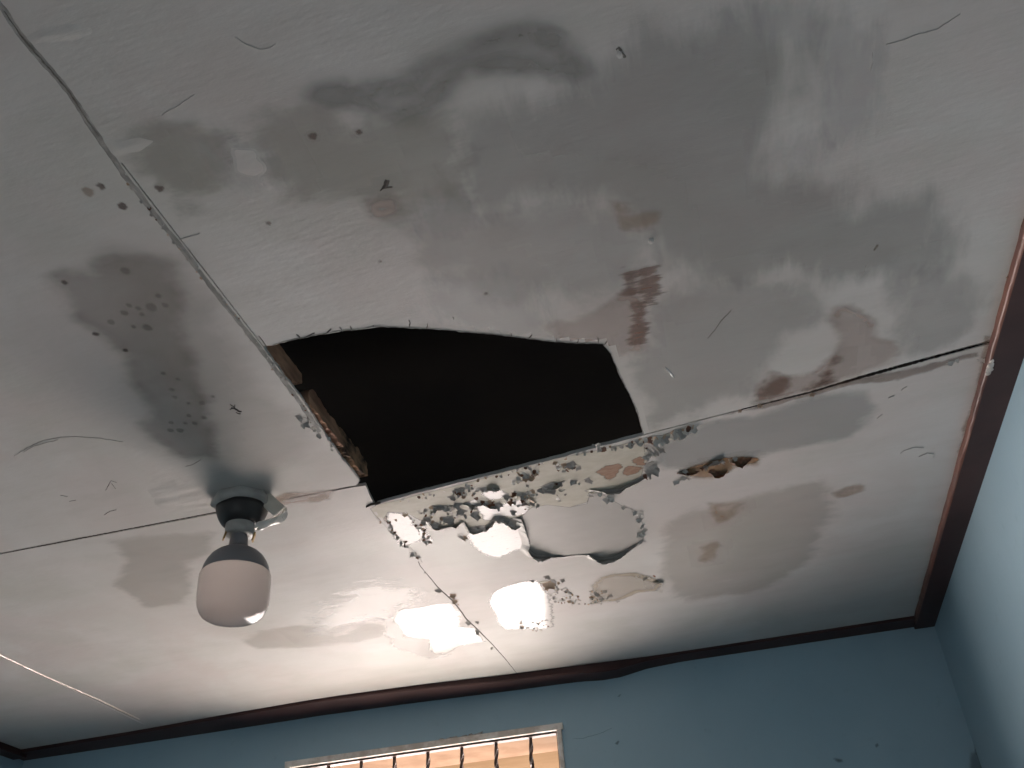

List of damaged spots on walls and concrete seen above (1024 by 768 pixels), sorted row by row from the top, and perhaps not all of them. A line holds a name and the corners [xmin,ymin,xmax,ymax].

rust [619,267,660,350]
peeling [245,334,333,451]
rust [759,379,790,398]
peeling [371,425,699,565]
peeling [673,456,758,485]
peeling [530,575,586,605]